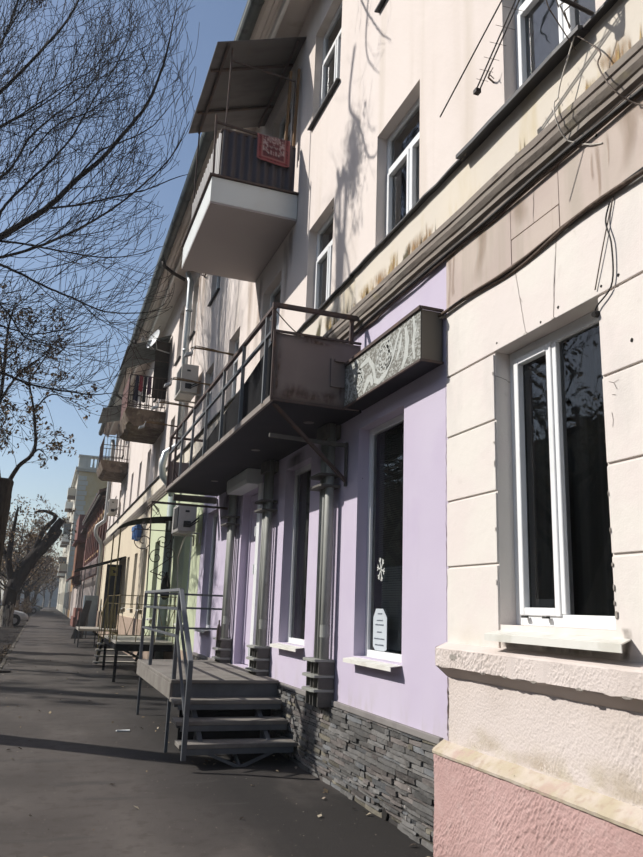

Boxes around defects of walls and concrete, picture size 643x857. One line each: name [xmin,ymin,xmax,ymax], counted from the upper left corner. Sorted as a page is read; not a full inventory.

rust [362,229,430,299]